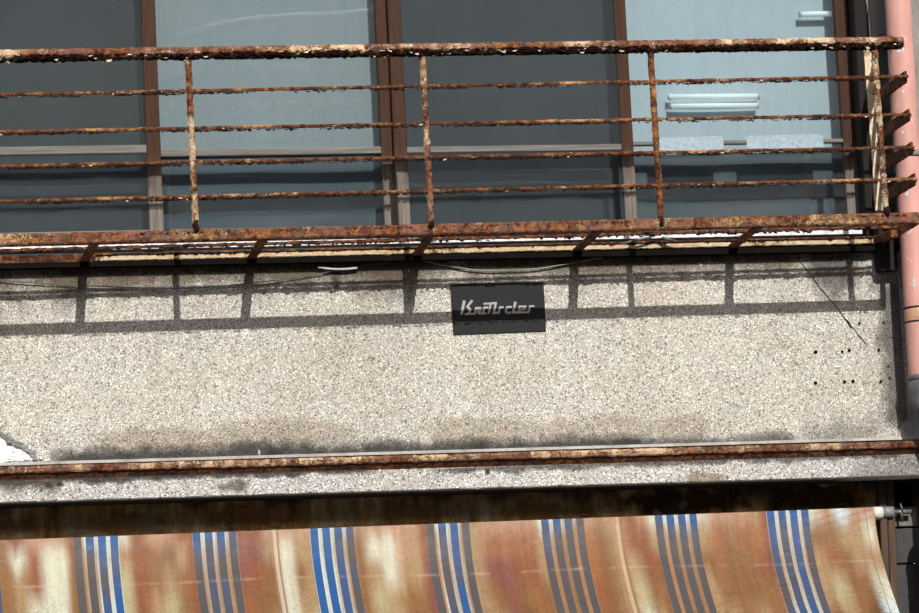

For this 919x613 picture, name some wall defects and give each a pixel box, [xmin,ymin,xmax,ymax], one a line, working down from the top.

corrosion [0,41,905,91]
corrosion [106,91,297,133]
corrosion [3,142,915,173]
corrosion [11,217,678,256]
crack [795,255,867,345]
spalling [0,432,51,463]
leakage [56,418,793,461]
corrosion [214,504,293,531]
corrosion [385,506,437,525]
corrosion [505,504,595,520]
corrosion [619,488,747,516]
corrosion [770,485,861,511]